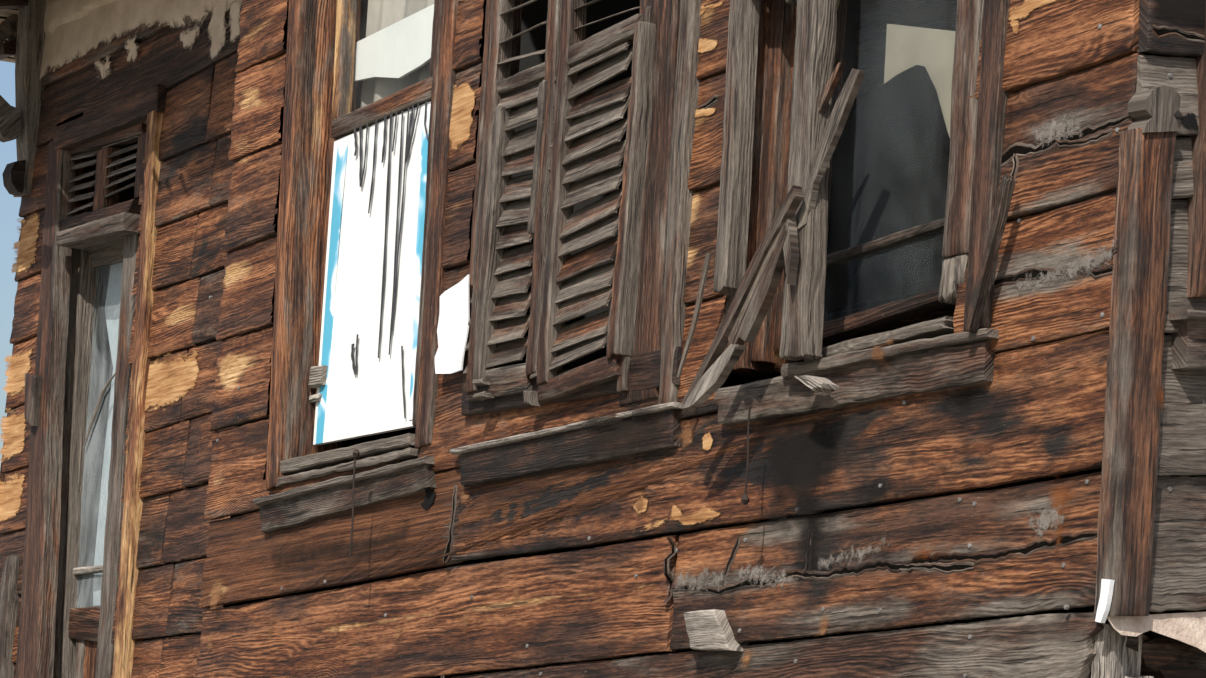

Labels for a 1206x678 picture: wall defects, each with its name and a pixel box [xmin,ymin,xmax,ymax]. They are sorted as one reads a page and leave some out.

peeling [40,0,242,79]
crack [1001,114,1131,179]
spalling [0,349,32,462]
spalling [145,349,199,411]
spalling [0,473,25,522]
crack [663,530,1100,603]
peeling [1095,579,1206,653]